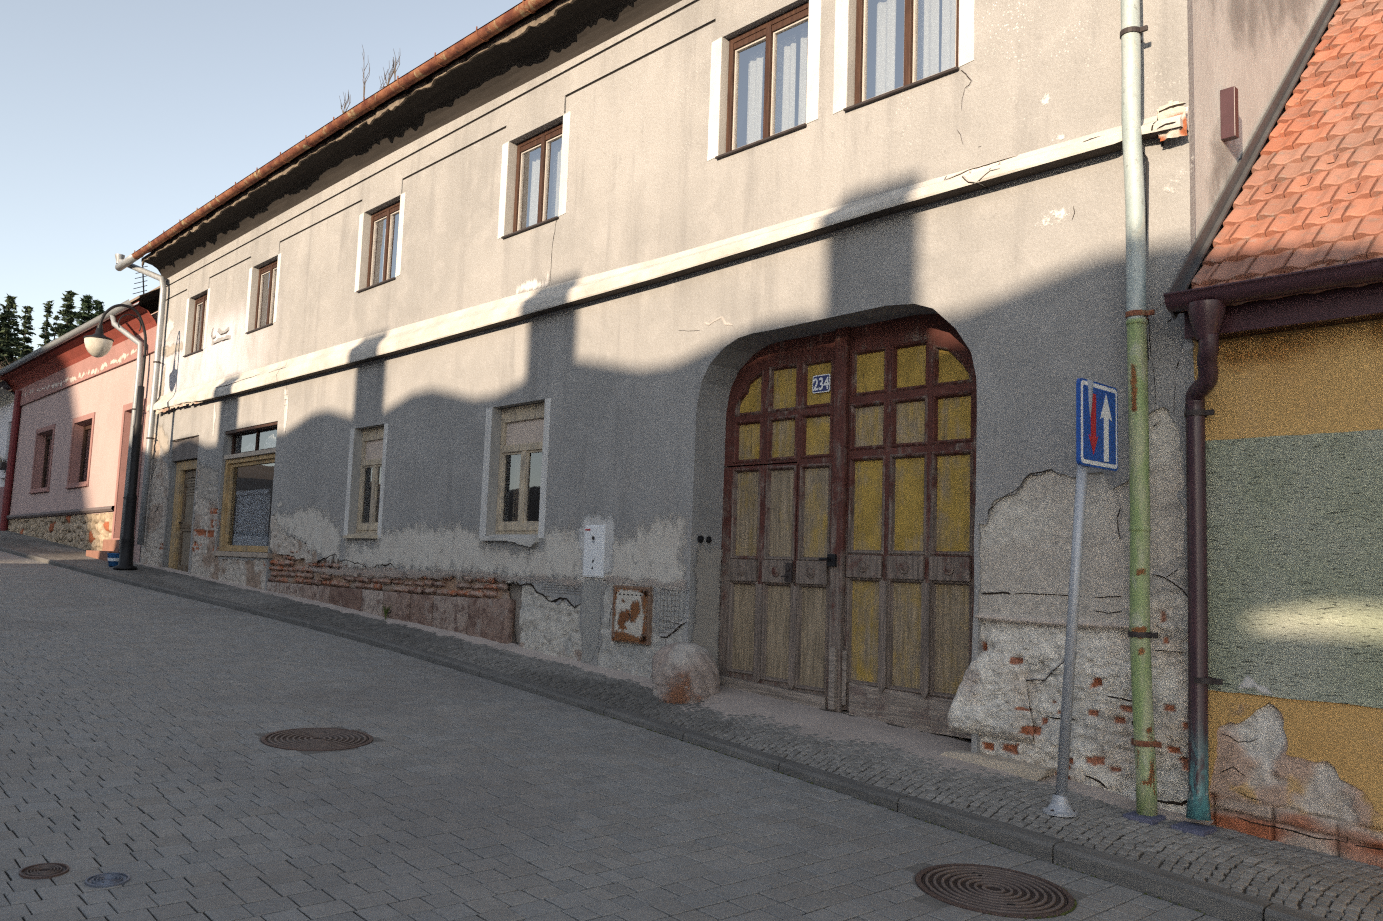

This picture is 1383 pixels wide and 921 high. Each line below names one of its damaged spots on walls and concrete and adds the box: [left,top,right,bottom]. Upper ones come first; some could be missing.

crack [944,69,1018,189]
rust [1130,364,1138,412]
peeling [191,462,723,679]
crack [509,580,613,620]
flaking render [975,470,1136,801]
flaking render [1149,407,1188,815]
rust [1137,750,1156,796]
flaking render [1209,676,1383,869]